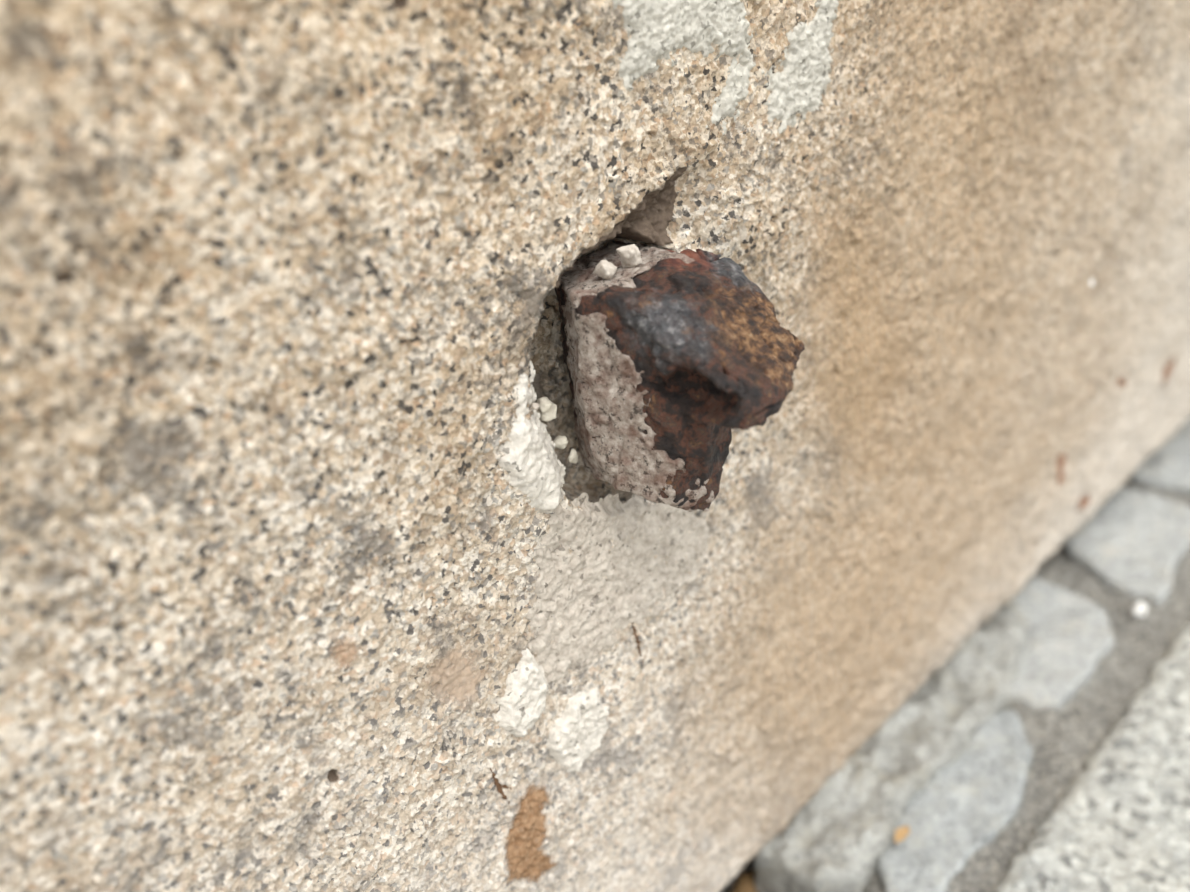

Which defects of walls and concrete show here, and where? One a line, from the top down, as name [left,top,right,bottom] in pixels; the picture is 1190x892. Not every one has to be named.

spalling [544,166,688,303]
corrosion [506,786,556,881]